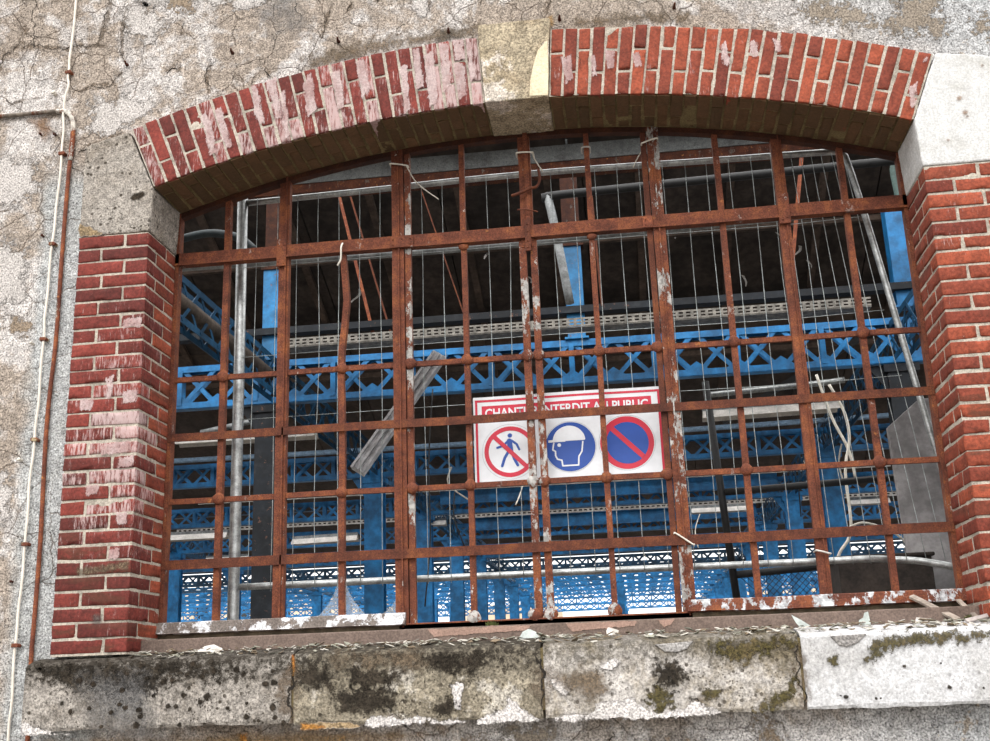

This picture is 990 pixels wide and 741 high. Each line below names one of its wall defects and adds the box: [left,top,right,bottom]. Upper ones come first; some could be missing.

crack [0,0,129,92]
mould [27,654,227,715]
damp [291,647,485,722]
damp [554,665,609,702]
mould [650,656,691,695]